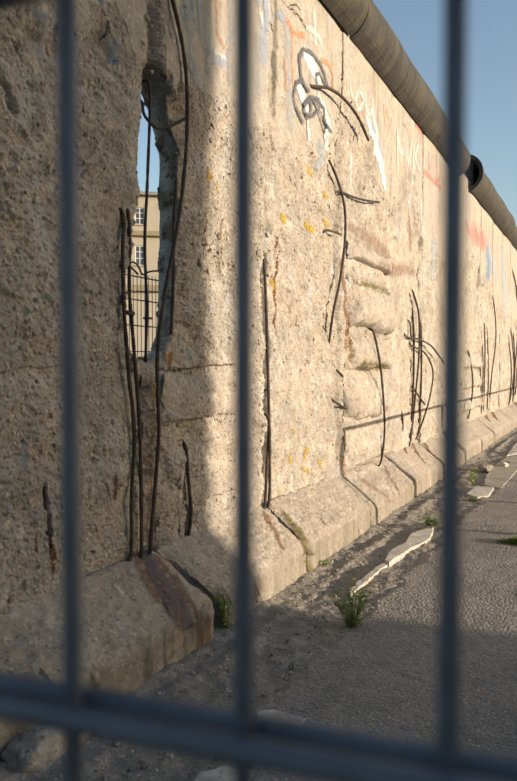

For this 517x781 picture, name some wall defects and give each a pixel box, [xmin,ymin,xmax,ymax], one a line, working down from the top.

spalling [0,0,62,614]
spalling [76,0,233,578]
rust [340,260,354,364]
spalling [254,0,441,510]
spalling [463,220,517,423]
rust [35,531,57,574]
rust [129,541,212,648]